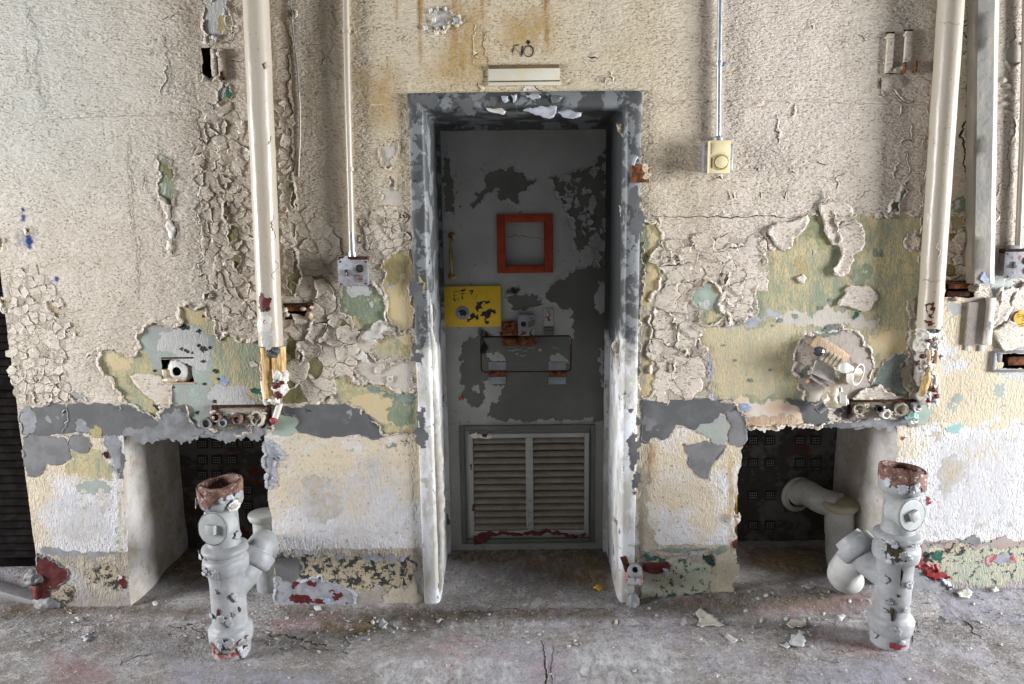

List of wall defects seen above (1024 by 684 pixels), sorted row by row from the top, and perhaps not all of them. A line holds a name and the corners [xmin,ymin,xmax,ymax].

peeling [410,91,438,109]
peeling [453,86,581,119]
crack [267,19,405,278]
peeling [0,80,429,496]
peeling [441,139,620,425]
crack [287,374,315,393]
peeling [619,185,1024,599]
peeling [35,547,127,603]
peeling [272,551,423,611]
crack [541,640,555,684]